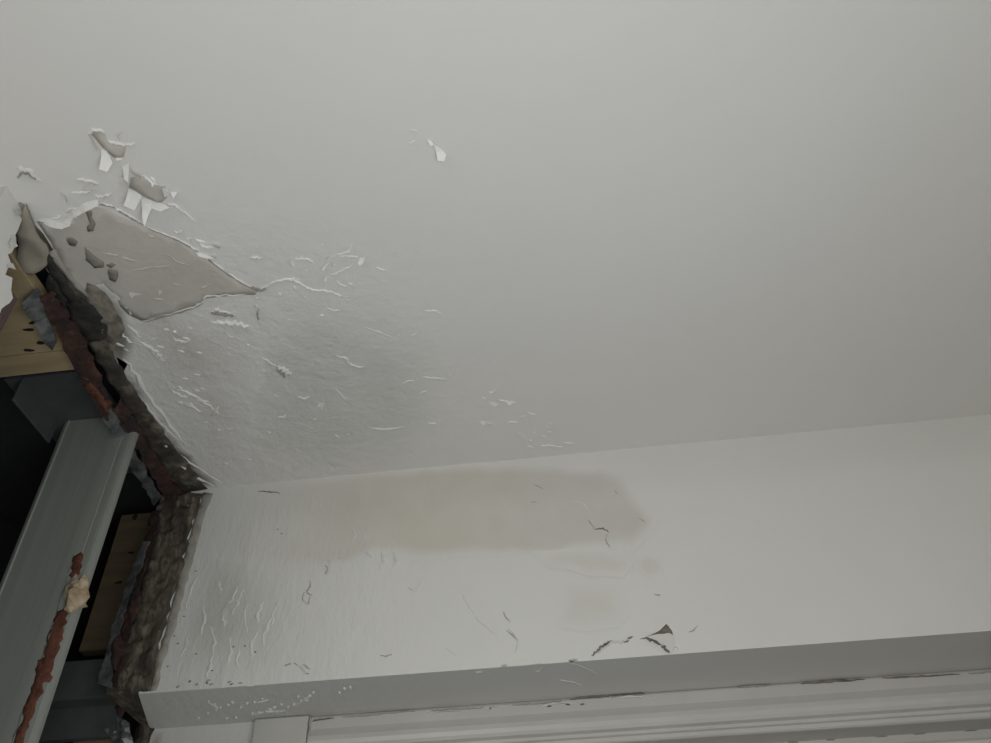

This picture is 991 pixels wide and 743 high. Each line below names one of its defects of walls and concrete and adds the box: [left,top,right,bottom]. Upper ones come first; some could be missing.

peeling [427,139,446,161]
crack [250,277,342,329]
peeling [35,127,259,743]
water stain [46,273,663,686]
corrosion [69,552,84,578]
crack [591,636,633,657]
corrosion [13,608,68,743]